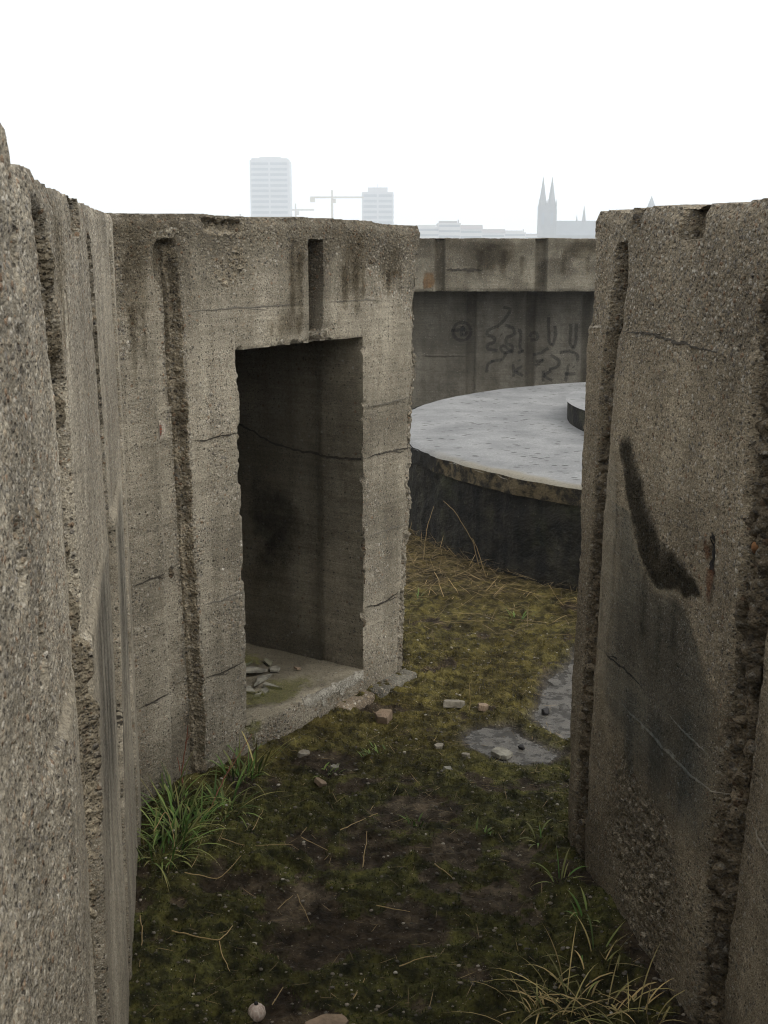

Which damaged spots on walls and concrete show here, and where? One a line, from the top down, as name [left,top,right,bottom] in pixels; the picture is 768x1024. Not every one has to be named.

crack [590,325,717,353]
crack [195,423,410,460]
crack [598,645,730,794]